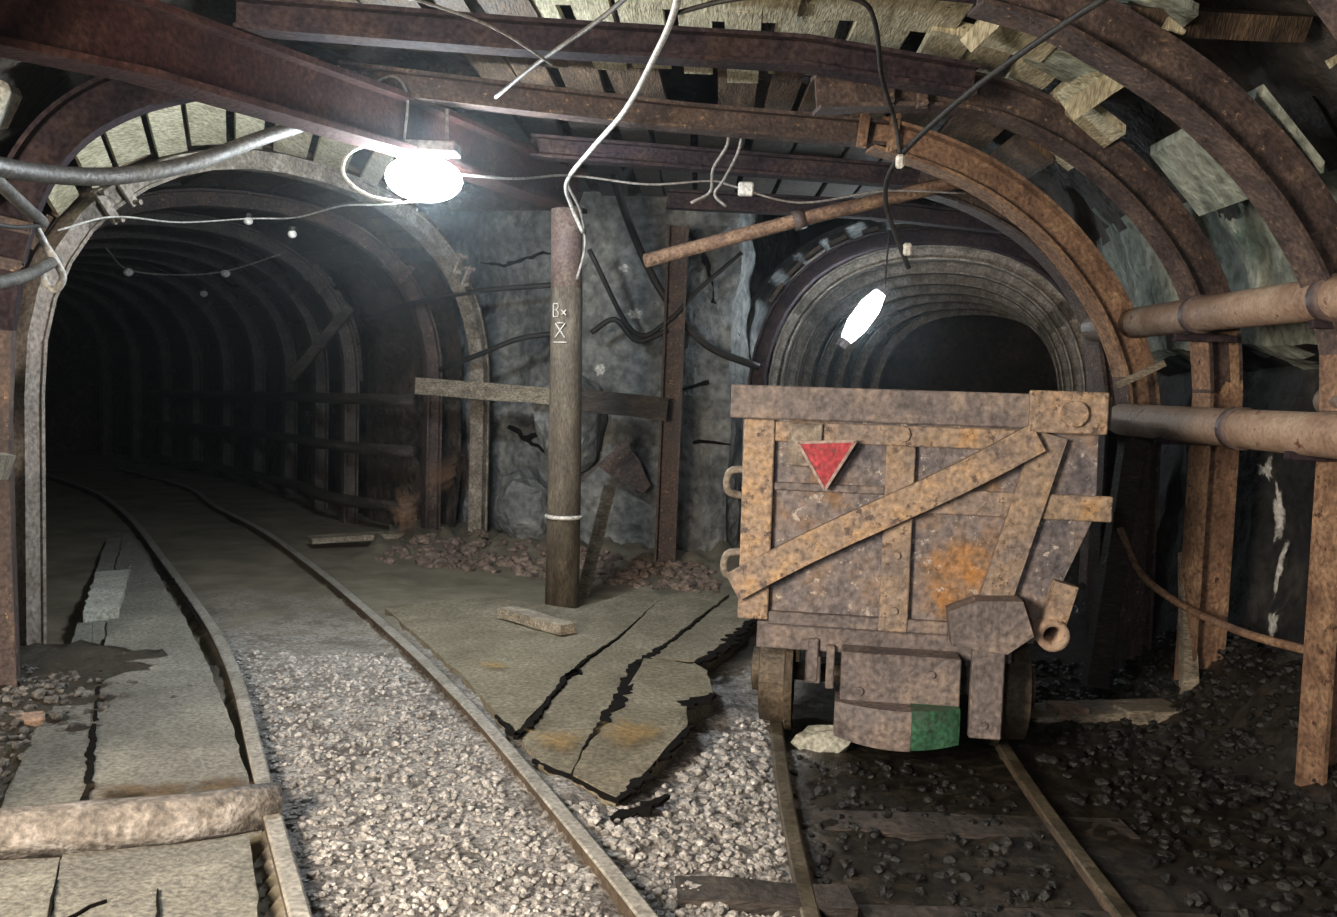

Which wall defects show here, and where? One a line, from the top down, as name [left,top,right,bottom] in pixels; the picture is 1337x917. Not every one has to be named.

crack [79,639,104,801]
crack [494,609,758,823]
crack [47,879,107,917]
crack [153,889,161,917]